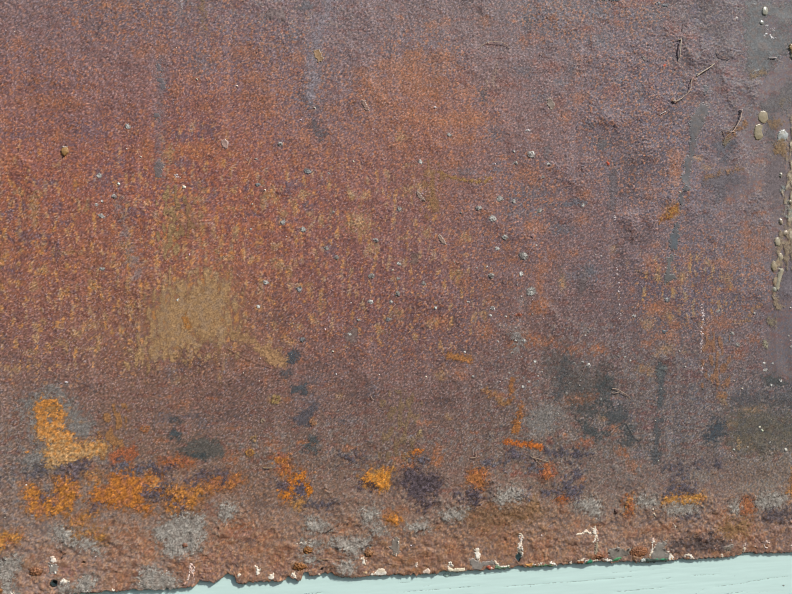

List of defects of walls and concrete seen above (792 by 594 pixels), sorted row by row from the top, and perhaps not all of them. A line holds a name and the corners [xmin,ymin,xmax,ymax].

peeling [743,0,792,78]
peeling [772,261,792,301]